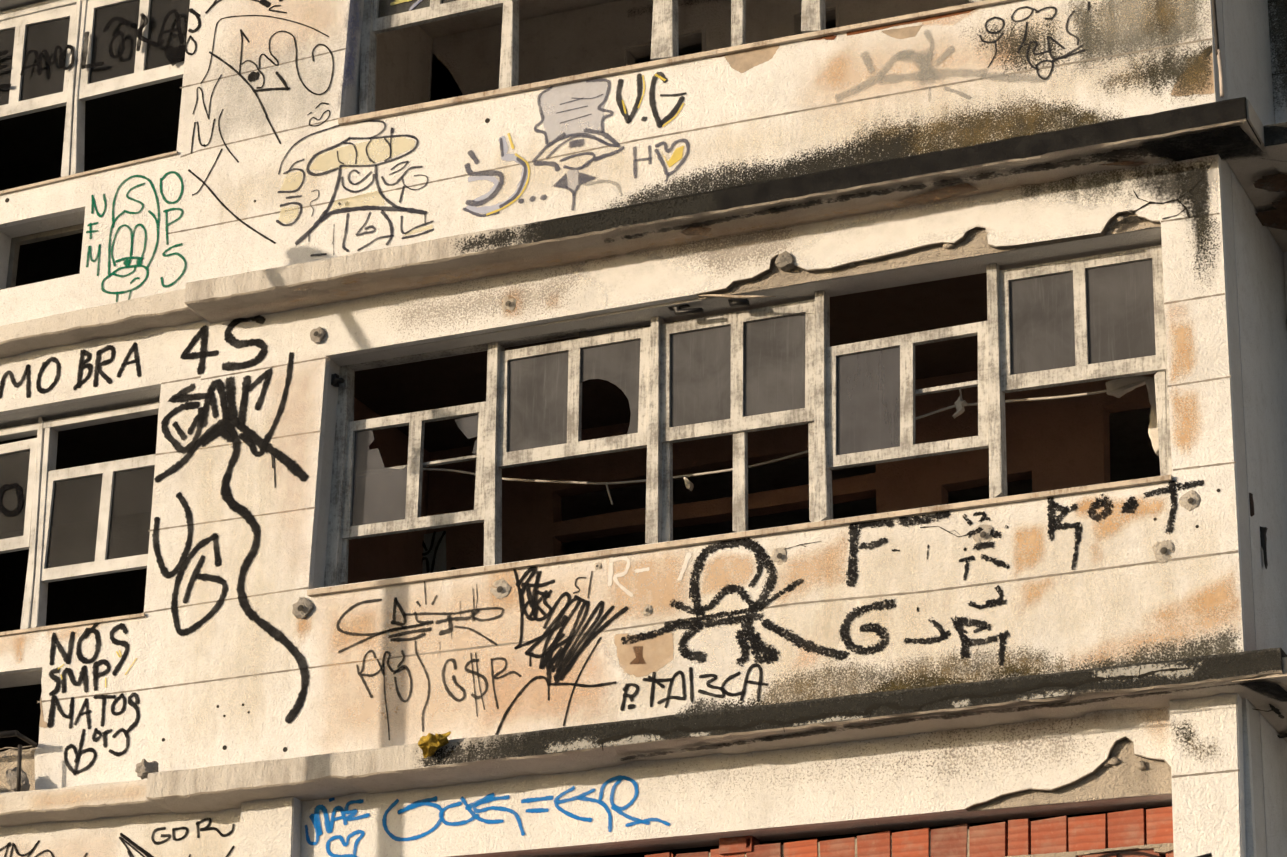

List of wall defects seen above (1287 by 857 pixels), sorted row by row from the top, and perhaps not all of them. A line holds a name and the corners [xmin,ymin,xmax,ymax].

peeling [705,45,780,73]
peeling [805,9,975,41]
damp [450,0,1287,286]
spalling [1101,209,1161,235]
peeling [1253,161,1287,230]
spalling [696,226,1016,299]
damp [416,625,1287,767]
spalling [965,736,1172,811]